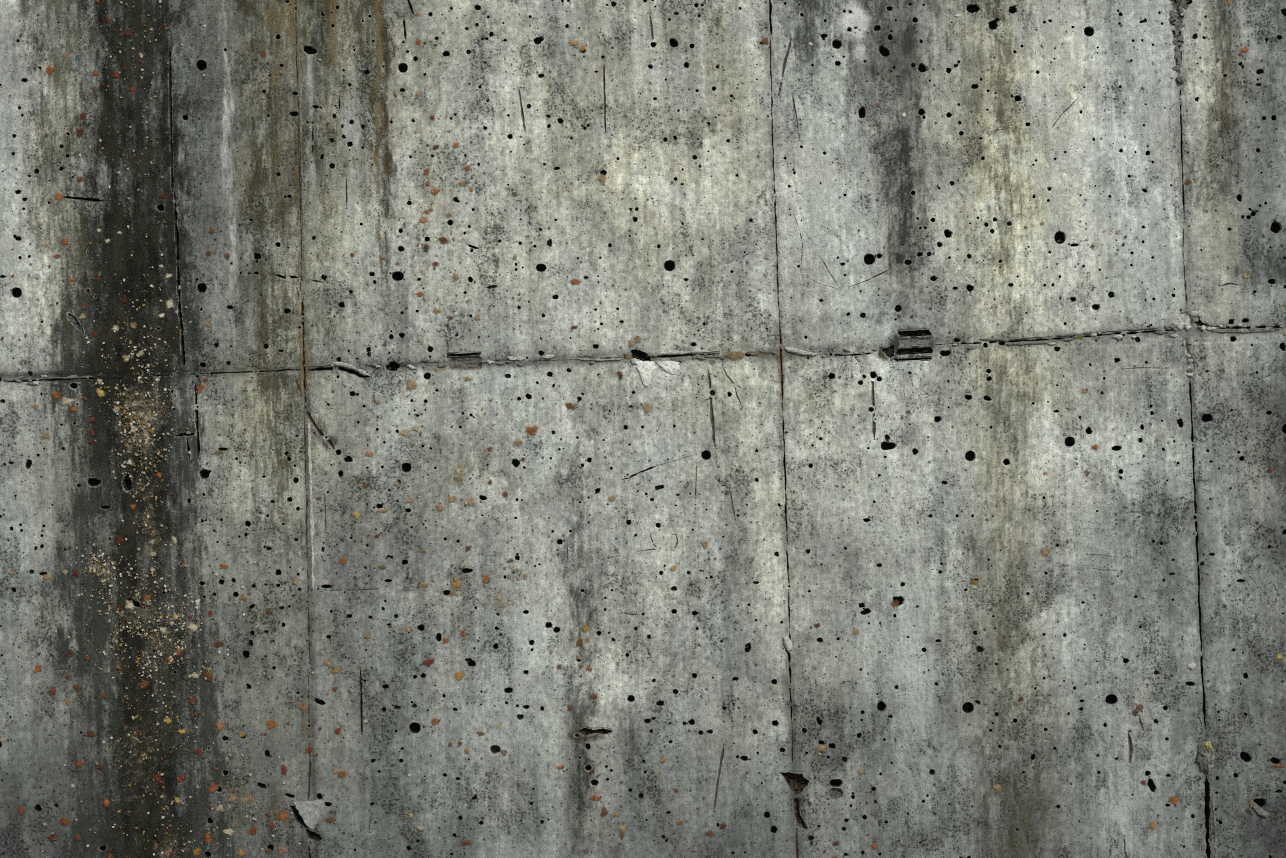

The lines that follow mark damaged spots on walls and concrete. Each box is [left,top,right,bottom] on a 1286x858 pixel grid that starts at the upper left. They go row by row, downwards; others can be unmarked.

damp [794,0,831,61]
damp [864,0,929,54]
damp [871,74,931,282]
damp [19,0,253,858]